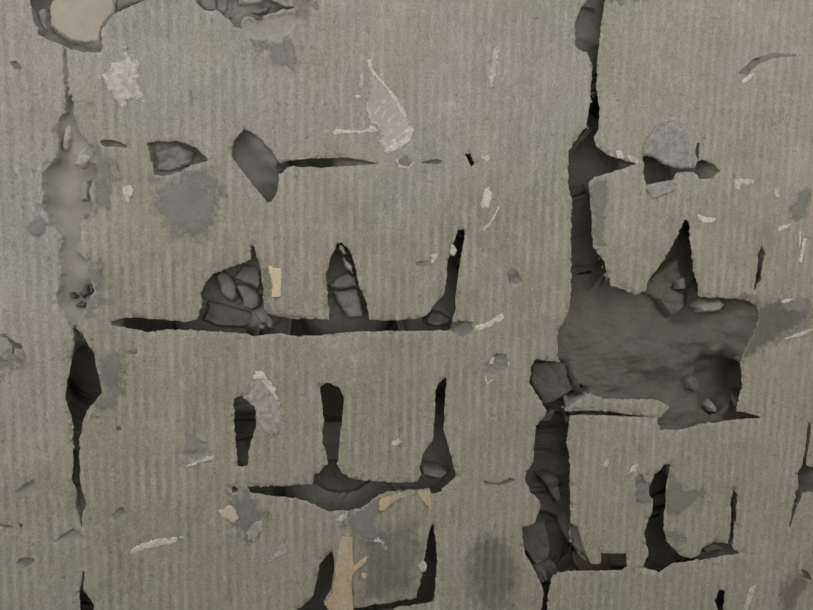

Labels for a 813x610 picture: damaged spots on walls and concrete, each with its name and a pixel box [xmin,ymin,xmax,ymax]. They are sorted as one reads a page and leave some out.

spalling [241,11,299,40]
crack [568,0,605,154]
crack [284,157,375,168]
spalling [557,219,760,430]
spalling [236,437,253,467]
spalling [248,378,456,512]
crack [789,423,813,527]